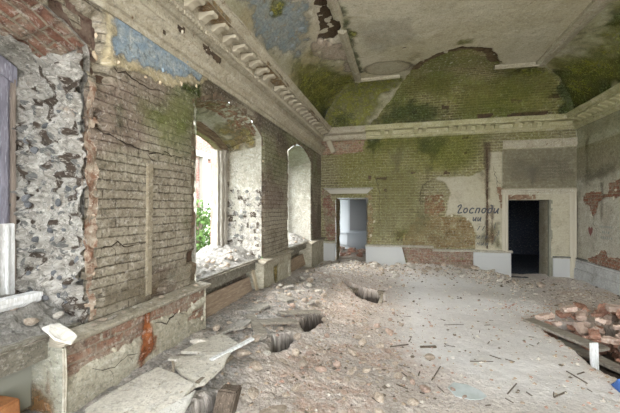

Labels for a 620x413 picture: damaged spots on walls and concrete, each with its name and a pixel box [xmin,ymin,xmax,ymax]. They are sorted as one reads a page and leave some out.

water stain [270,1,285,17]
peeling [247,0,352,72]
crack [114,67,178,96]
water stain [295,63,448,127]
flaking render [370,47,565,125]
flaking render [0,0,208,325]
crack [97,128,191,175]
flaking render [583,179,620,218]
flaking render [396,194,475,269]
flaking render [588,250,620,271]
flaking render [62,289,204,381]